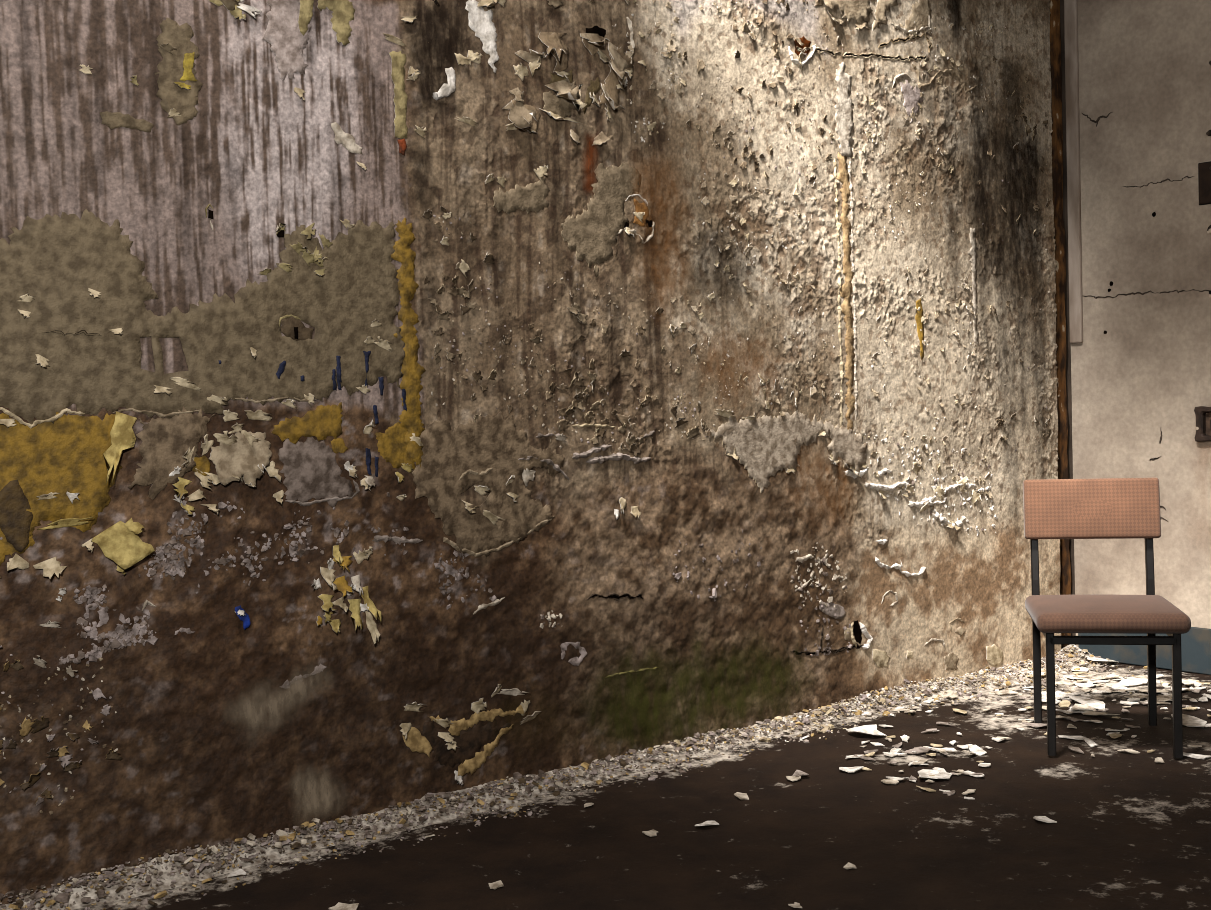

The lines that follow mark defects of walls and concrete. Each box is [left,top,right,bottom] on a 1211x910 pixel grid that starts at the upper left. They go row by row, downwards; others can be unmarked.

peeling [331,122,367,170]
rust [585,136,596,190]
water stain [968,126,1037,270]
peeling [363,0,1060,557]
peeling [0,209,405,579]